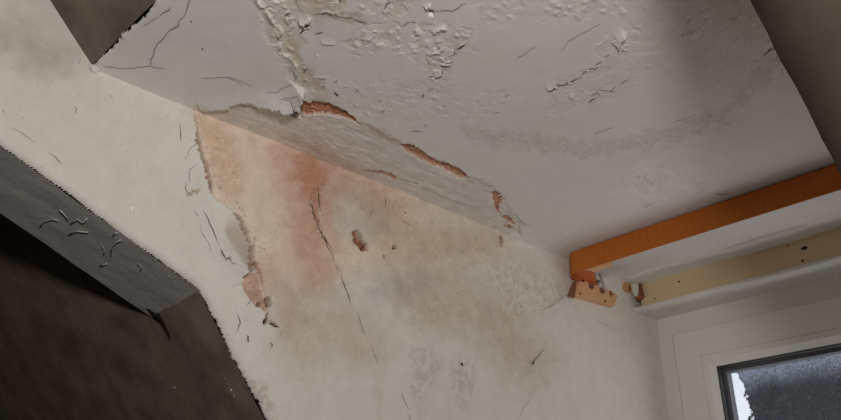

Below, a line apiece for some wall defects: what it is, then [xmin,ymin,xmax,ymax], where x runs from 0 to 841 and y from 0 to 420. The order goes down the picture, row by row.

crack [113,0,190,69]
spalling [184,0,780,311]